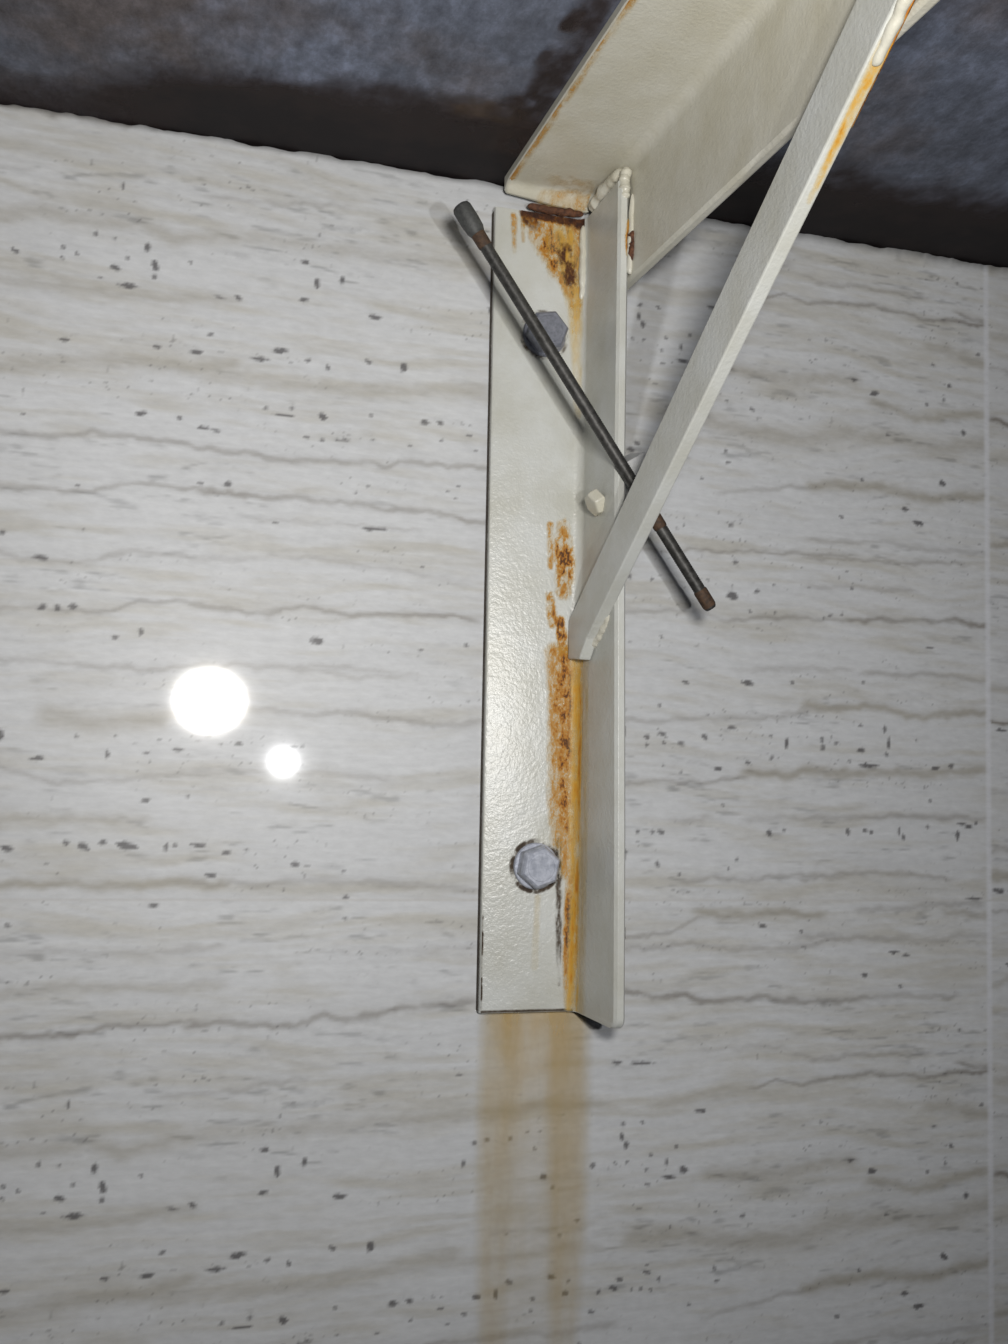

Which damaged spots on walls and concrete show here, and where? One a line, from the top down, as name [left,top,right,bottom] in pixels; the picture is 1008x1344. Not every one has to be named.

corrosion [511,192,591,332]
corrosion [547,522,583,1018]